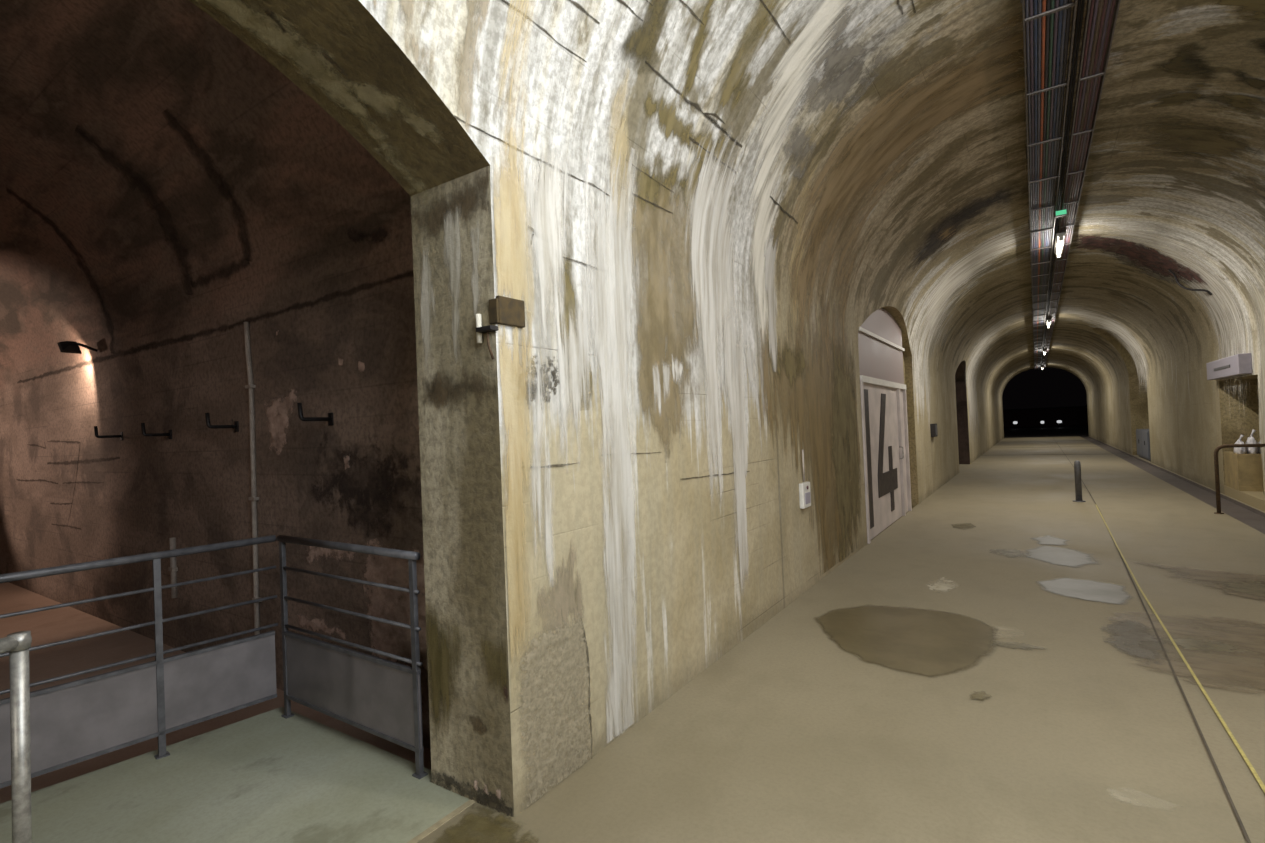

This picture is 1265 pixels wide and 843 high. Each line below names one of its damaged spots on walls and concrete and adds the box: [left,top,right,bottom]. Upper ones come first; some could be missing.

crack [502,0,587,62]
crack [569,0,704,25]
crack [760,0,791,44]
crack [645,61,742,174]
leakage [525,0,888,741]
peeling [264,390,297,455]
leakage [312,445,420,537]
leakage [426,614,460,727]
leakage [483,641,508,691]
leakage [1103,612,1265,690]
leakage [437,809,538,843]